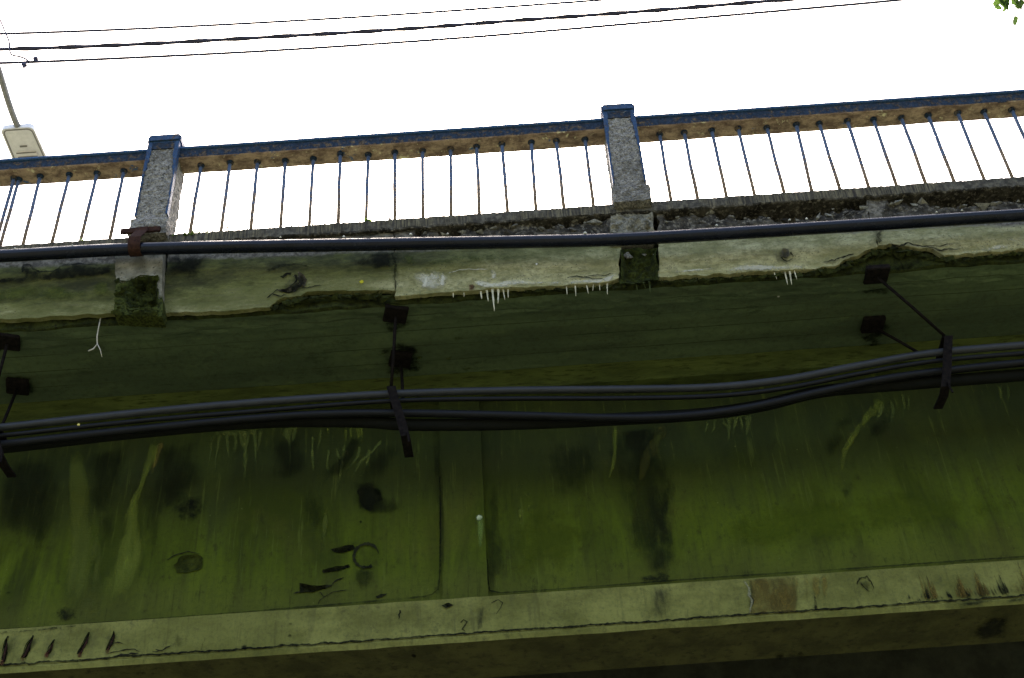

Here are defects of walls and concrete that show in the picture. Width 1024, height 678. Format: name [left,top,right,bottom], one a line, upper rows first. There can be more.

spalling [0,198,1024,348]
crack [892,242,956,251]
crack [0,581,1024,666]